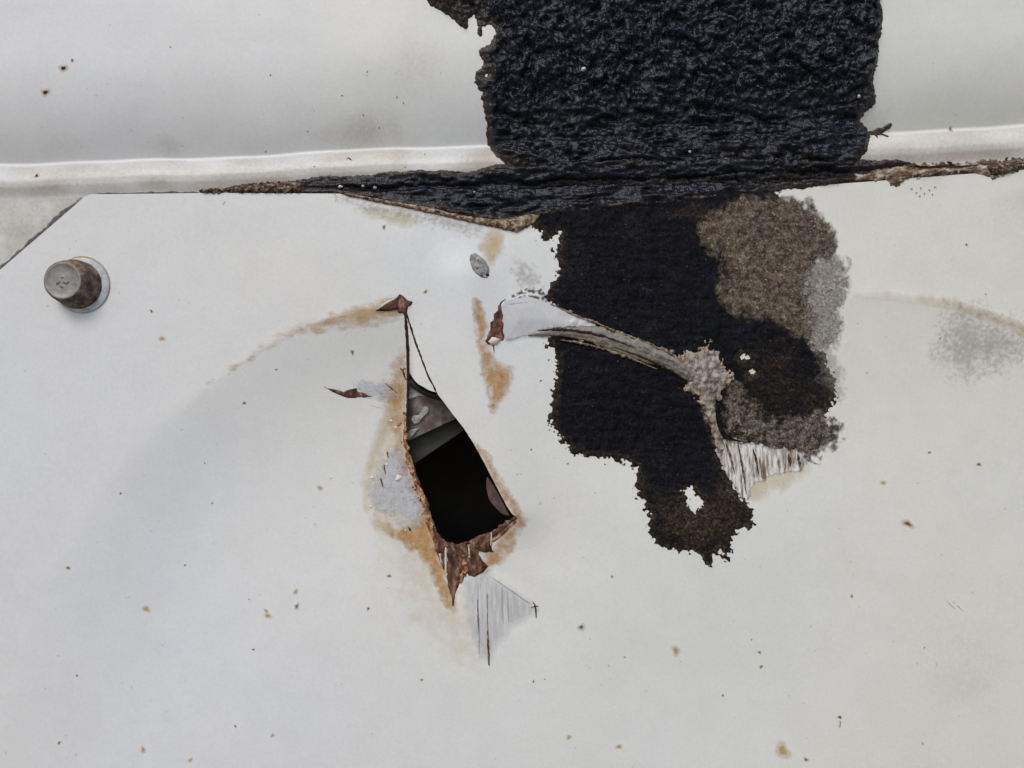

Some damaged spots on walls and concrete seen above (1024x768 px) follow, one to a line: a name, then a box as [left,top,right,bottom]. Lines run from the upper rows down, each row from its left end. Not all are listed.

corrosion [318,294,413,330]
corrosion [475,299,509,409]
corrosion [325,373,520,607]